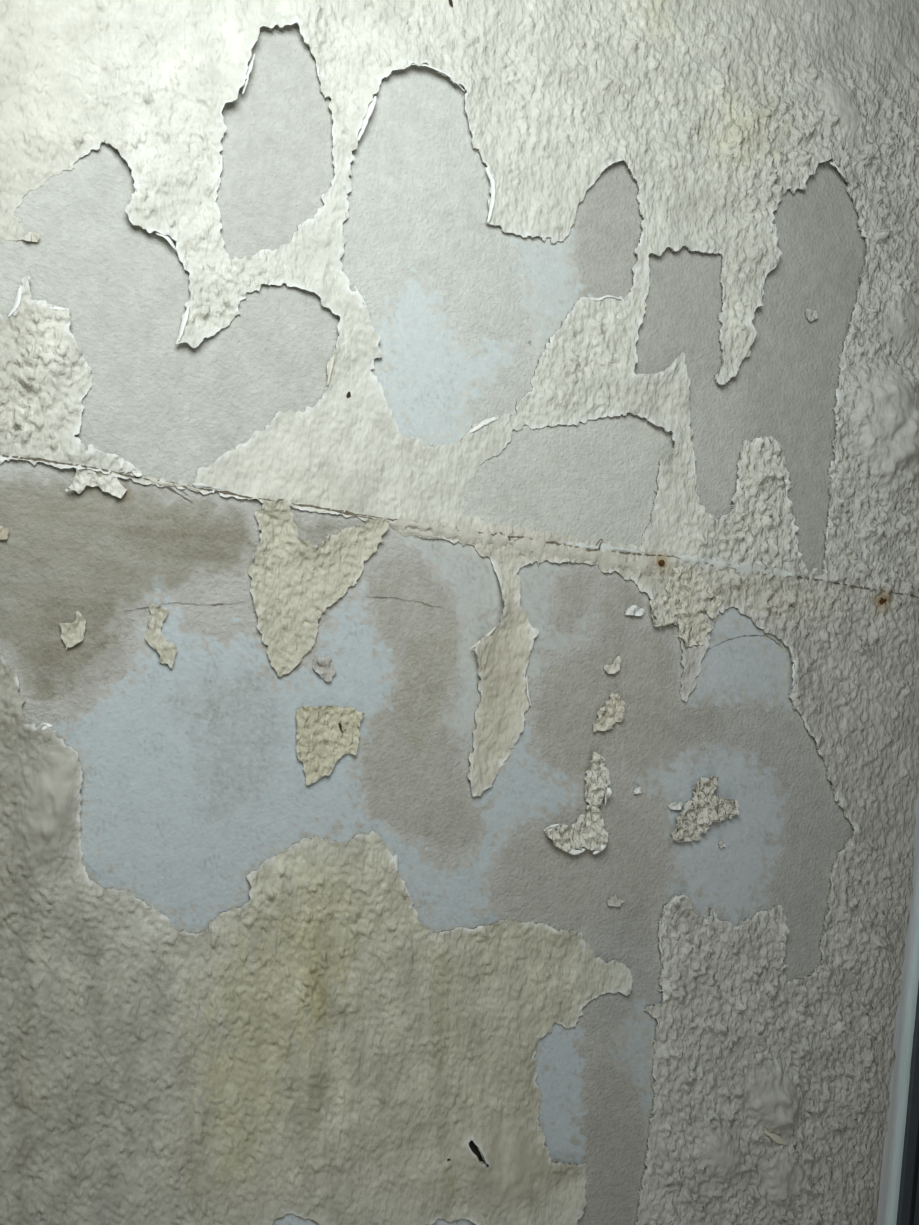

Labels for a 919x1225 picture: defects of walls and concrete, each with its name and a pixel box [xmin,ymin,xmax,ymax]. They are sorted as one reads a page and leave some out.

peeling [0,141,340,480]
peeling [215,23,866,575]
crack [122,601,247,612]
crack [2,455,919,598]
peeling [0,459,853,1225]